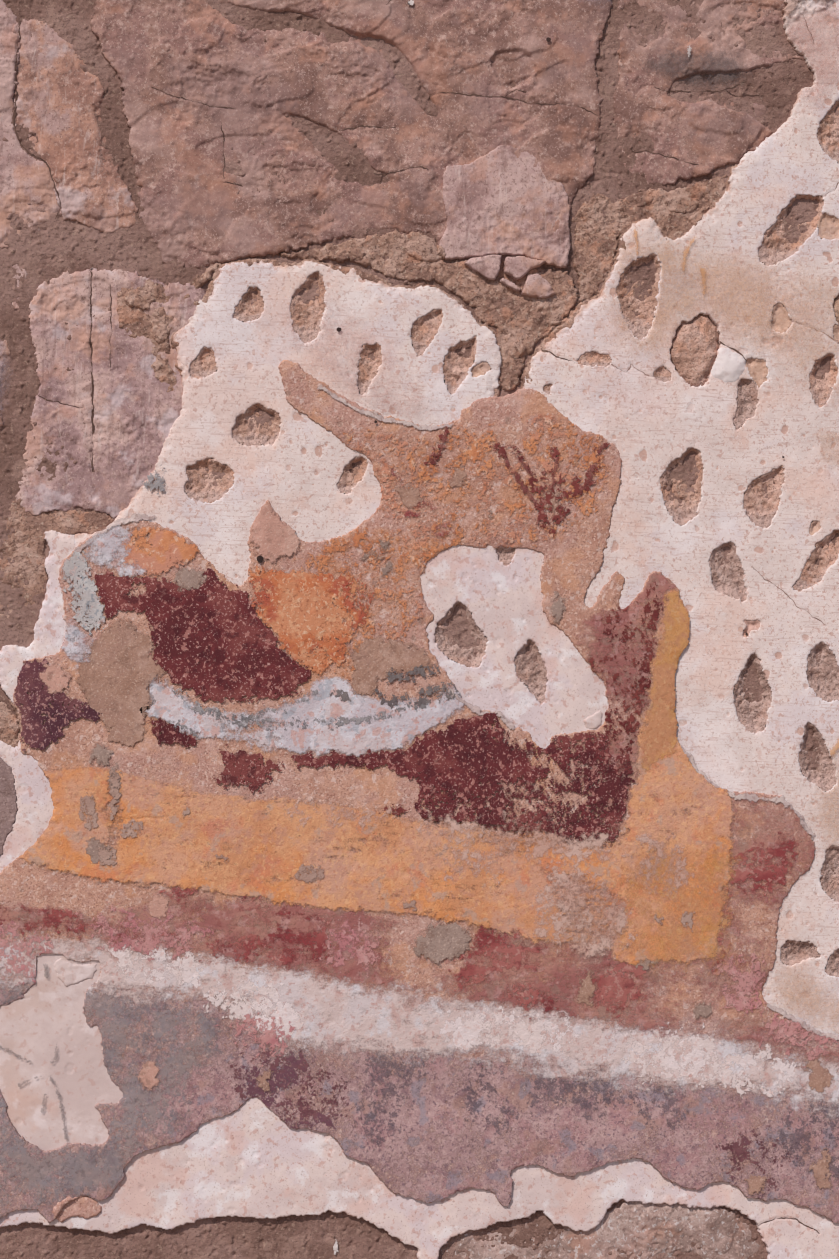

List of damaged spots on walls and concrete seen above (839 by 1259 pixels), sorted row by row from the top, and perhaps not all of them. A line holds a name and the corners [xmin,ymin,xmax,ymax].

hole [758,195,839,266]
spalling [117,164,738,397]
flaking render [770,303,792,333]
crack [39,271,112,472]
hole [660,448,703,526]
peeling [0,530,74,873]
hole [733,653,772,734]
flaking render [820,845,839,902]
peeling [0,1097,839,1259]